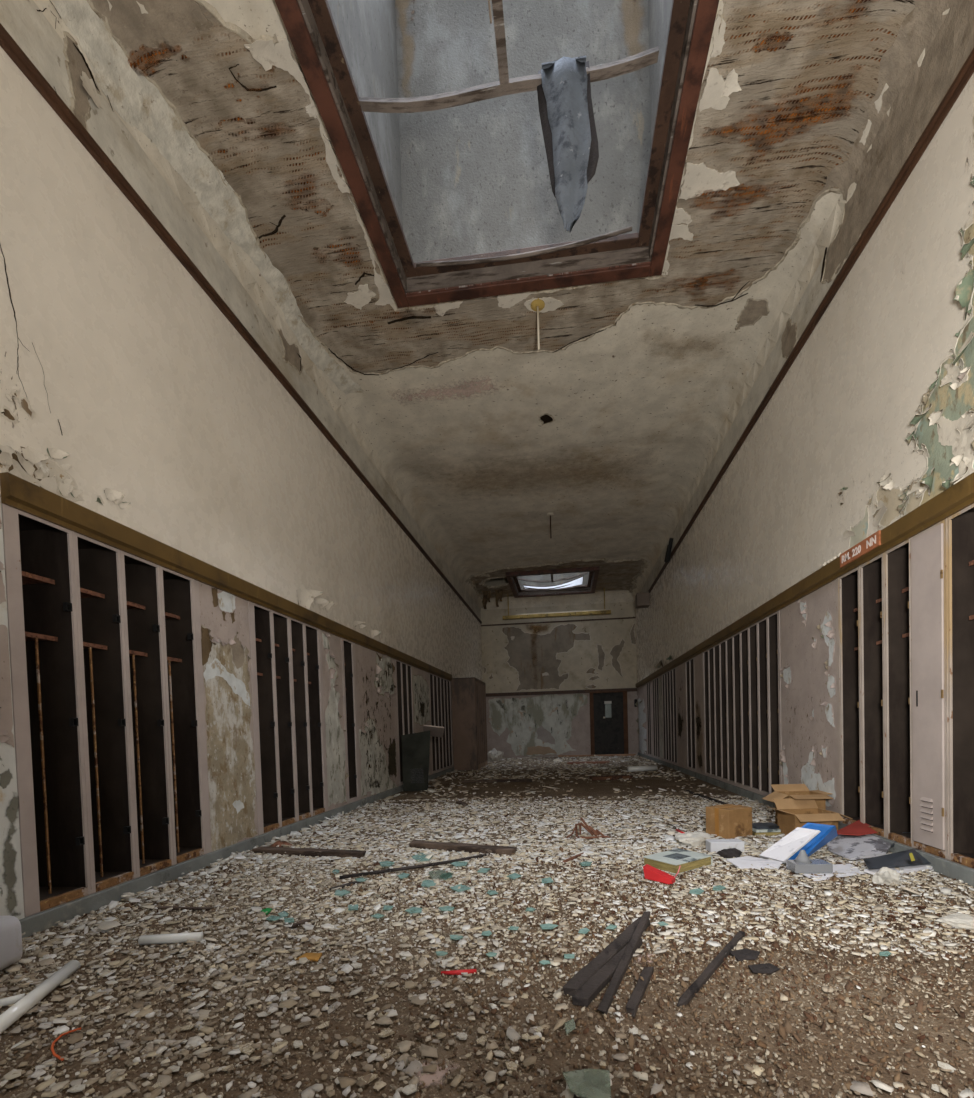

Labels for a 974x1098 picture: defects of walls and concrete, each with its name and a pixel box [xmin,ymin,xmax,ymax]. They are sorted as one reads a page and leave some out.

flaking render [63,31,103,133]
flaking render [86,0,974,375]
peeling [0,389,37,424]
crack [0,244,63,435]
peeling [0,445,131,509]
spalling [538,413,555,426]
peeling [822,201,974,566]
peeling [201,587,258,851]
peeling [779,745,837,808]
peeling [797,600,836,729]